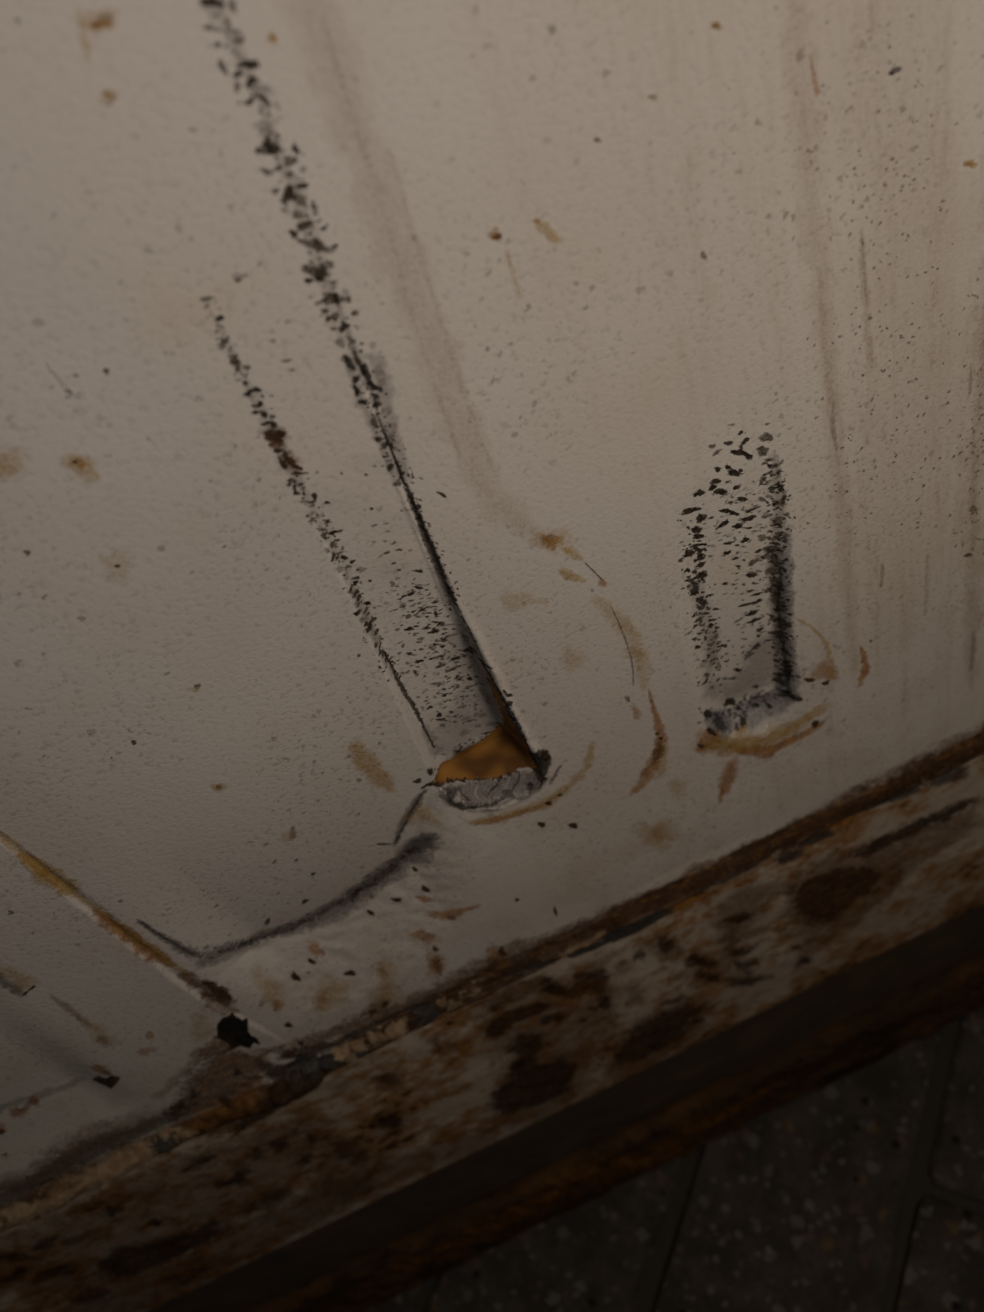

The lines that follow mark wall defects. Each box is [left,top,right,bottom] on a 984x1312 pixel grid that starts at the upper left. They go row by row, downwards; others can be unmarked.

damp [358,367,458,607]
damp [384,651,435,748]
peeling [527,749,551,791]
rust [633,692,666,792]
rust [698,707,823,800]
rust [0,832,236,1010]
crack [139,839,434,963]
rust [167,724,984,1138]
peeling [217,1013,260,1051]